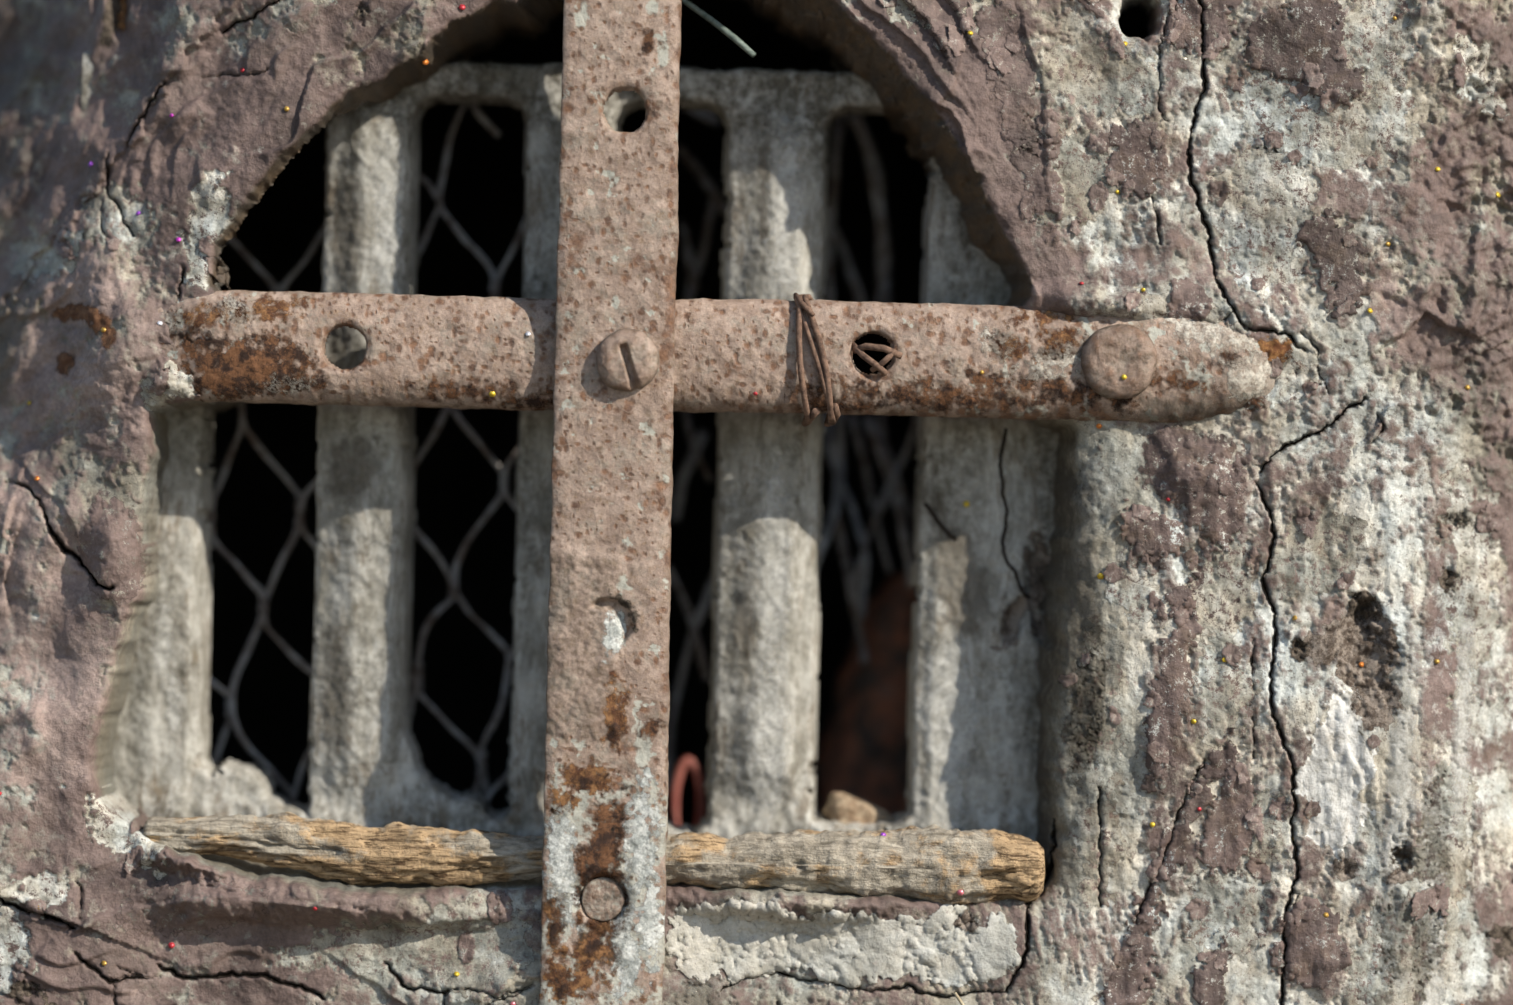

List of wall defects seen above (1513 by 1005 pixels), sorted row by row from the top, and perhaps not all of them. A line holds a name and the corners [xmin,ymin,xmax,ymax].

corrosion [642,28,654,54]
spalling [10,127,326,324]
peeling [879,0,1432,320]
corrosion [160,291,327,401]
corrosion [784,310,1136,413]
crack [9,481,114,590]
spalling [137,360,318,805]
spalling [410,407,519,810]
crack [1158,0,1384,1005]
crack [0,879,325,1005]
corrosion [539,671,669,1005]
crack [771,819,1057,1004]